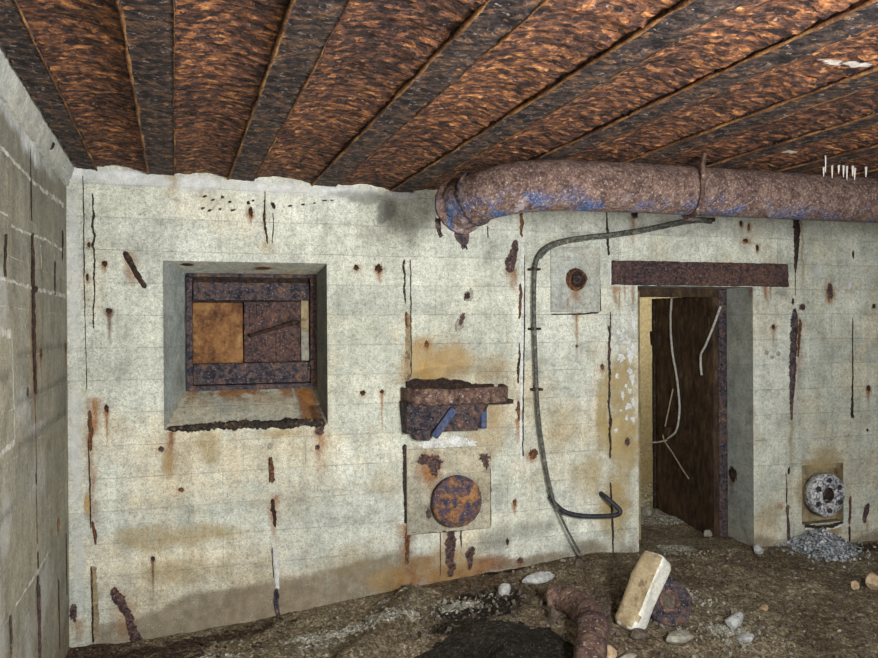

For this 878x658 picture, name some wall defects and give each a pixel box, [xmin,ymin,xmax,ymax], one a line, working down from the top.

rust [505,240,518,277]
rust [87,398,109,451]
rust [416,454,444,480]
water stain [597,358,639,530]
rust [84,496,97,545]
water stain [98,524,409,644]
rust [375,531,523,589]